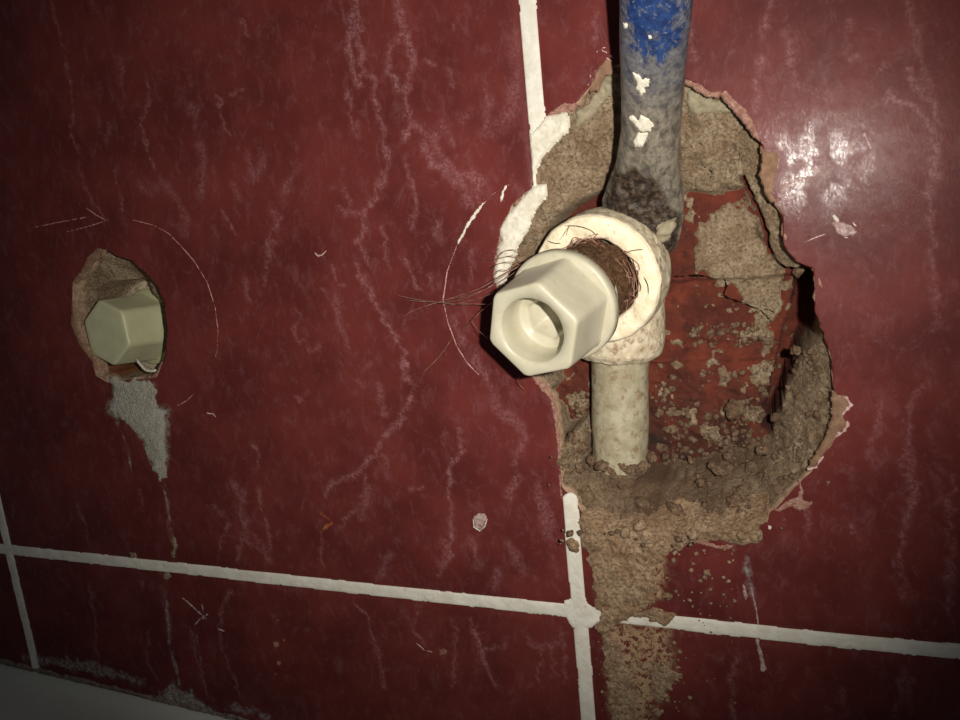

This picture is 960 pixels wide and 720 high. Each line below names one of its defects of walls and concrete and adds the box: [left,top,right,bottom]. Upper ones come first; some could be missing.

spalling [503,47,621,286]
spalling [71,248,164,371]
spalling [120,359,163,379]
spalling [534,79,853,549]
crack [673,274,781,322]